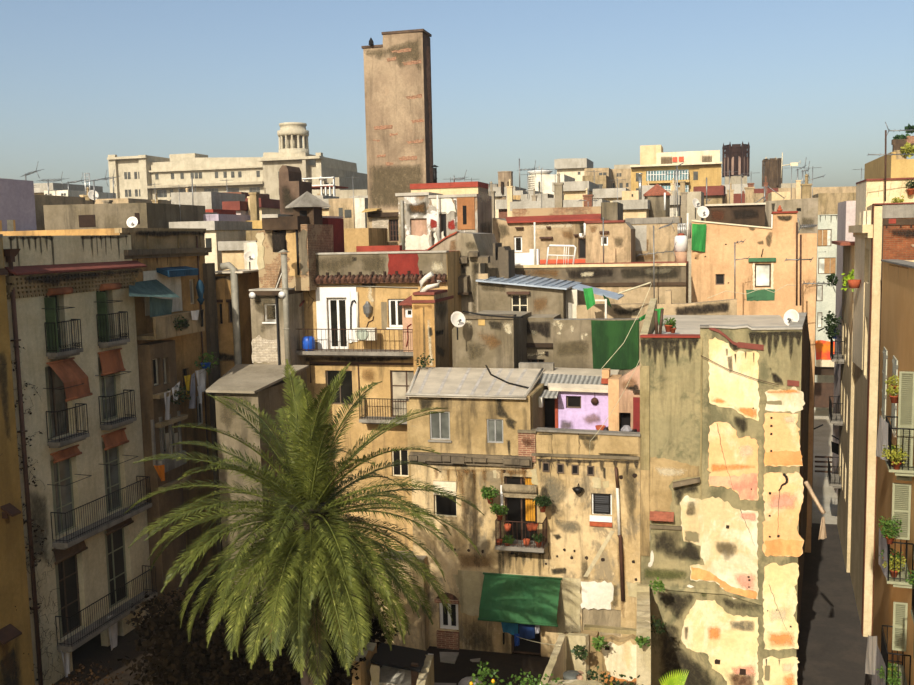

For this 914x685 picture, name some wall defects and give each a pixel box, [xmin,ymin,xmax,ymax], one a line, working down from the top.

damp [9,236,54,265]
damp [81,235,128,256]
damp [641,338,698,367]
peeling [650,338,805,685]
crack [777,473,788,532]